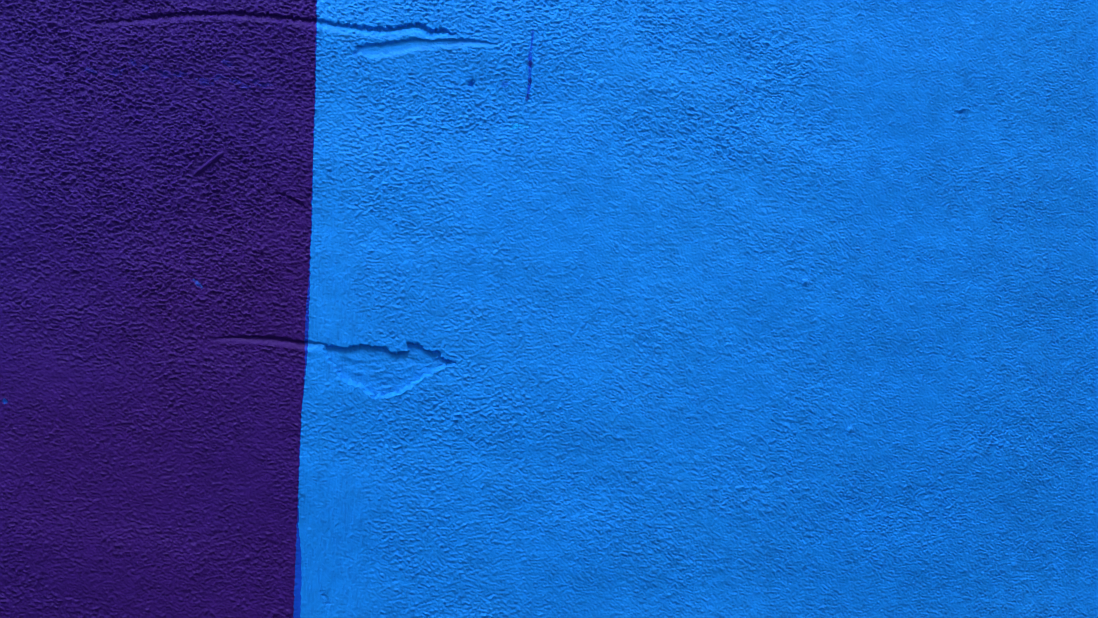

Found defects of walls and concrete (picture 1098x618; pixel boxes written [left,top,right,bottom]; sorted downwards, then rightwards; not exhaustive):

crack [97,11,490,61]
crack [214,335,326,353]
flaking render [322,342,456,399]